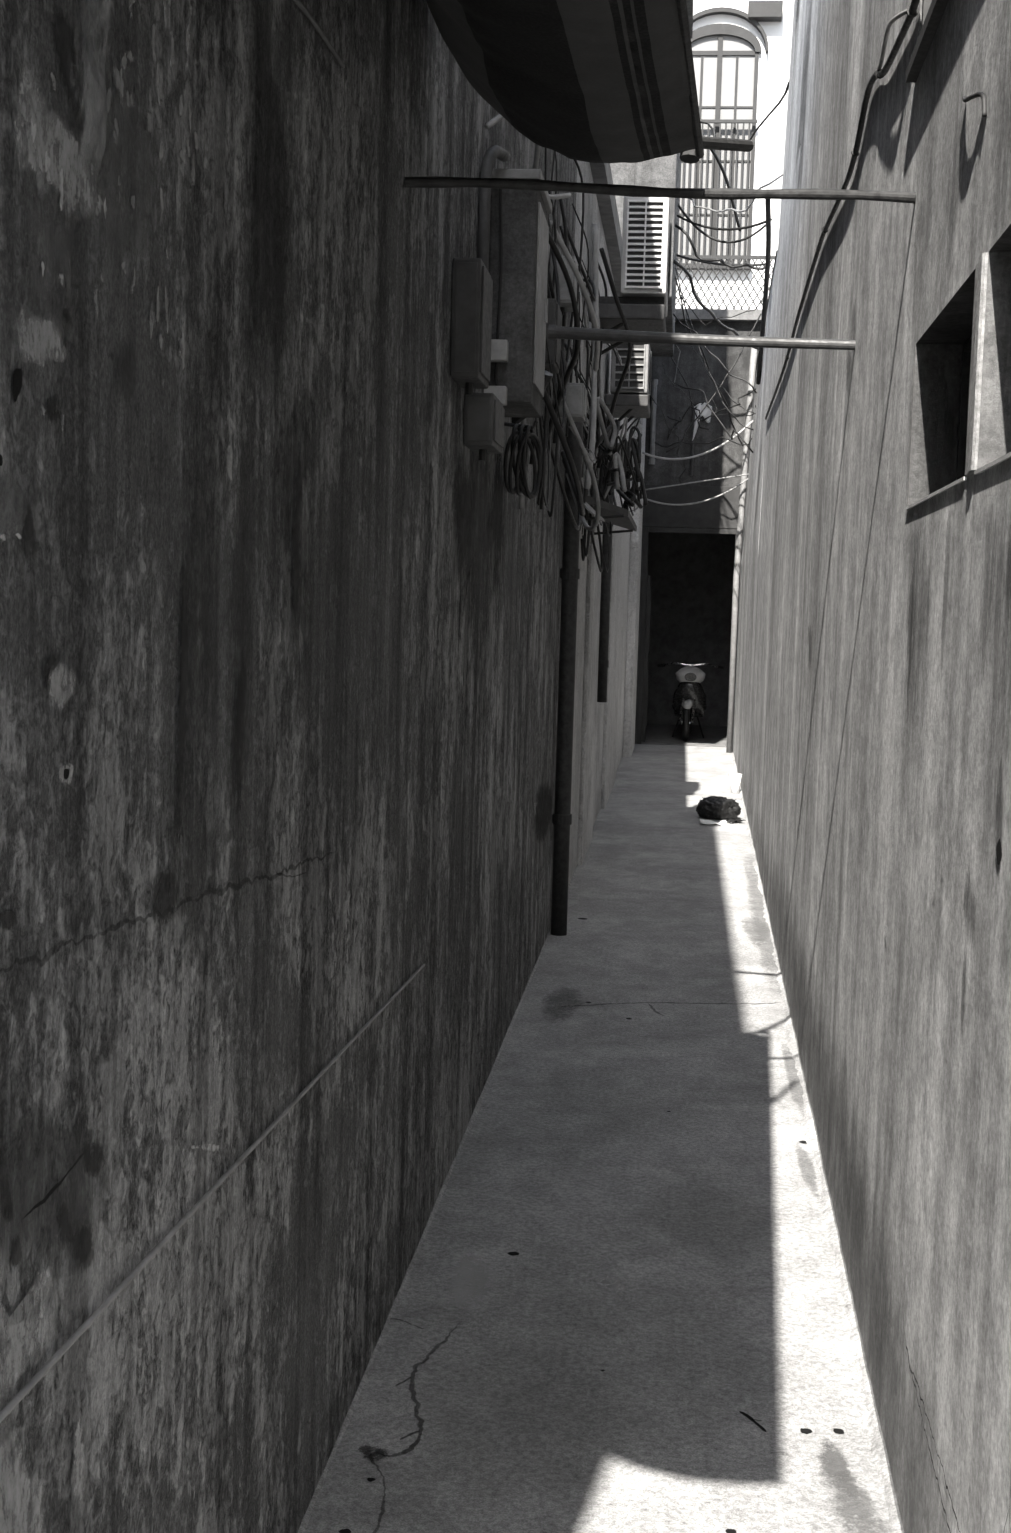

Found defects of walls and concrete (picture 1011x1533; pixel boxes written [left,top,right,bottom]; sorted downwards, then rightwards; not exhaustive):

crack [0,854,329,972]
damp [0,1097,104,1273]
damp [768,884,916,1533]
crack [371,1318,454,1533]